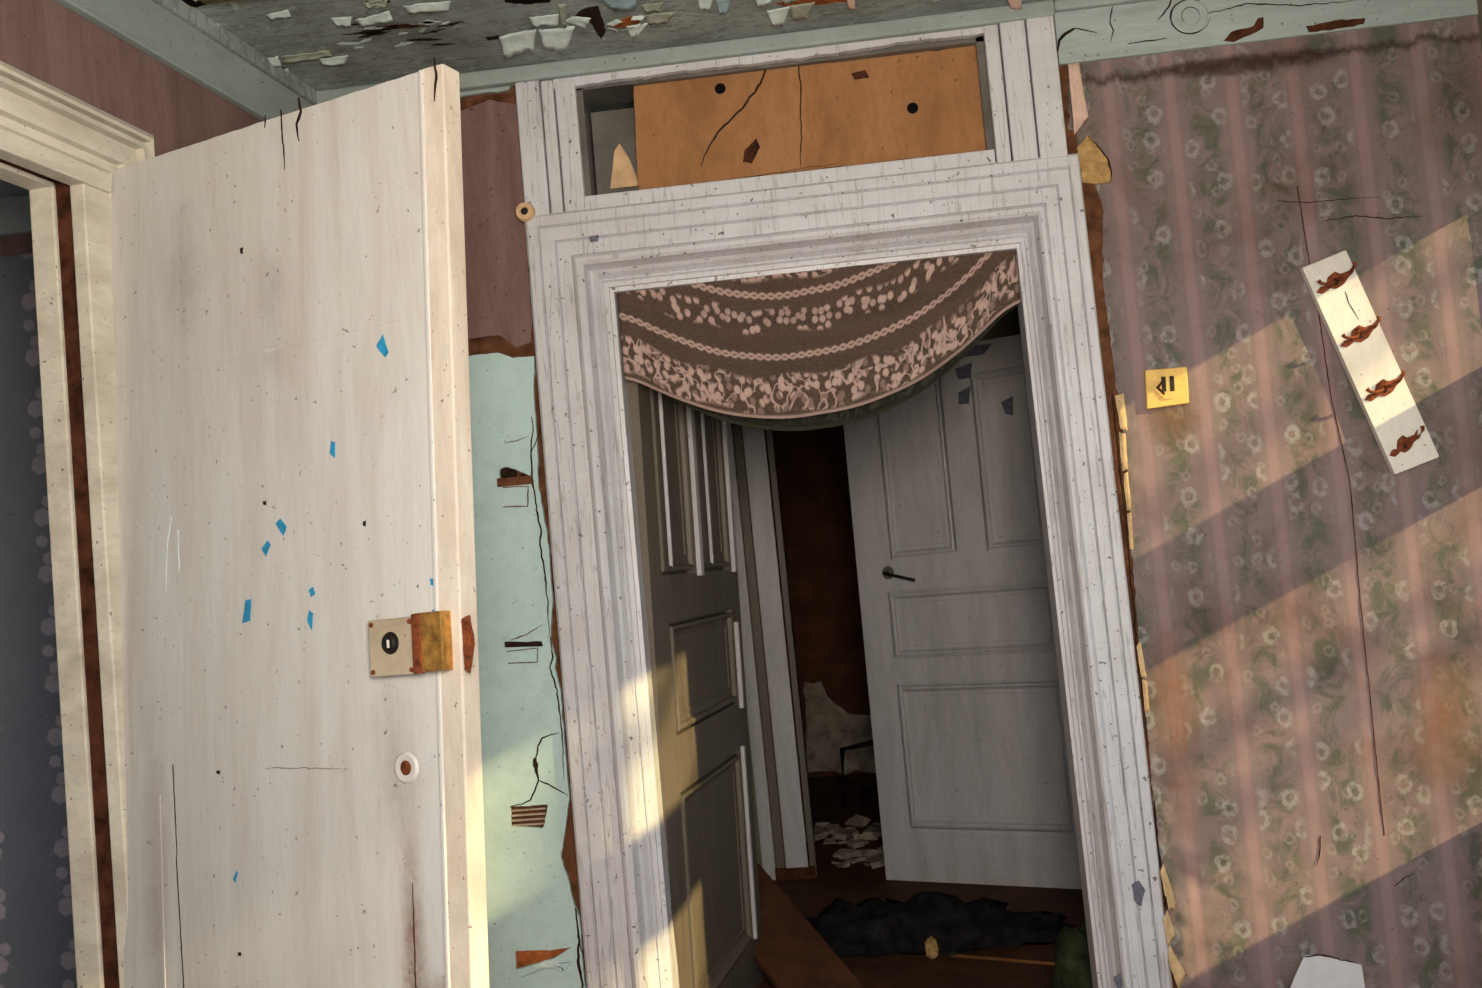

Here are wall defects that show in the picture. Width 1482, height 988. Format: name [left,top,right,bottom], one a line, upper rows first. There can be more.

peeling [265,0,464,73]
peeling [486,0,677,59]
peeling [1224,17,1264,42]
peeling [1307,18,1365,32]
crack [701,66,802,166]
crack [1277,186,1421,264]
spalling [497,467,533,507]
crack [1318,292,1385,835]
crack [506,417,568,807]
peeling [461,615,475,673]
spalling [505,626,543,664]
spalling [516,948,571,977]